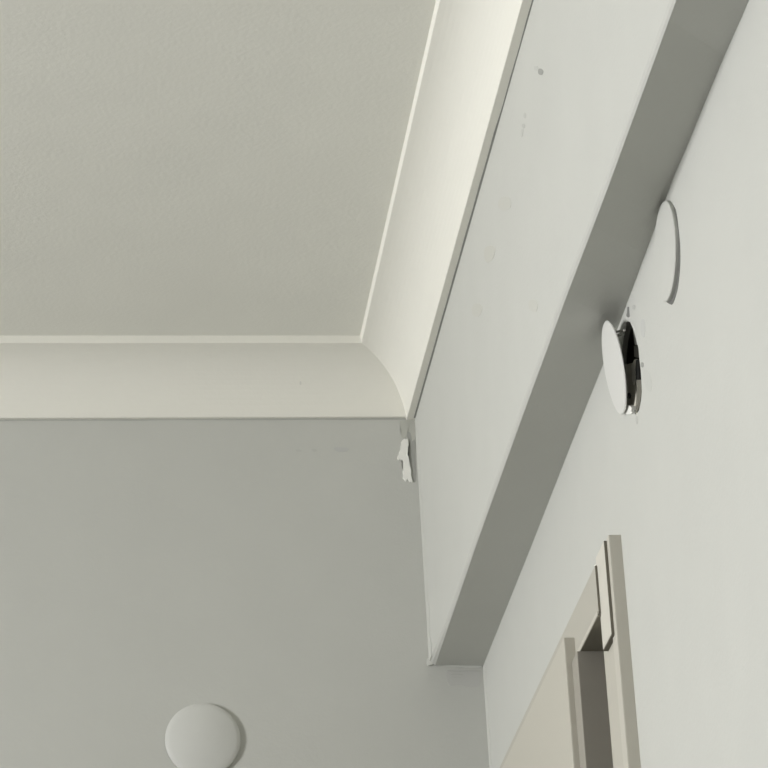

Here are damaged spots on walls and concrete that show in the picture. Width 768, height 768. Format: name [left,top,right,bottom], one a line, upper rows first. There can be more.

flaking render [397,439,412,483]